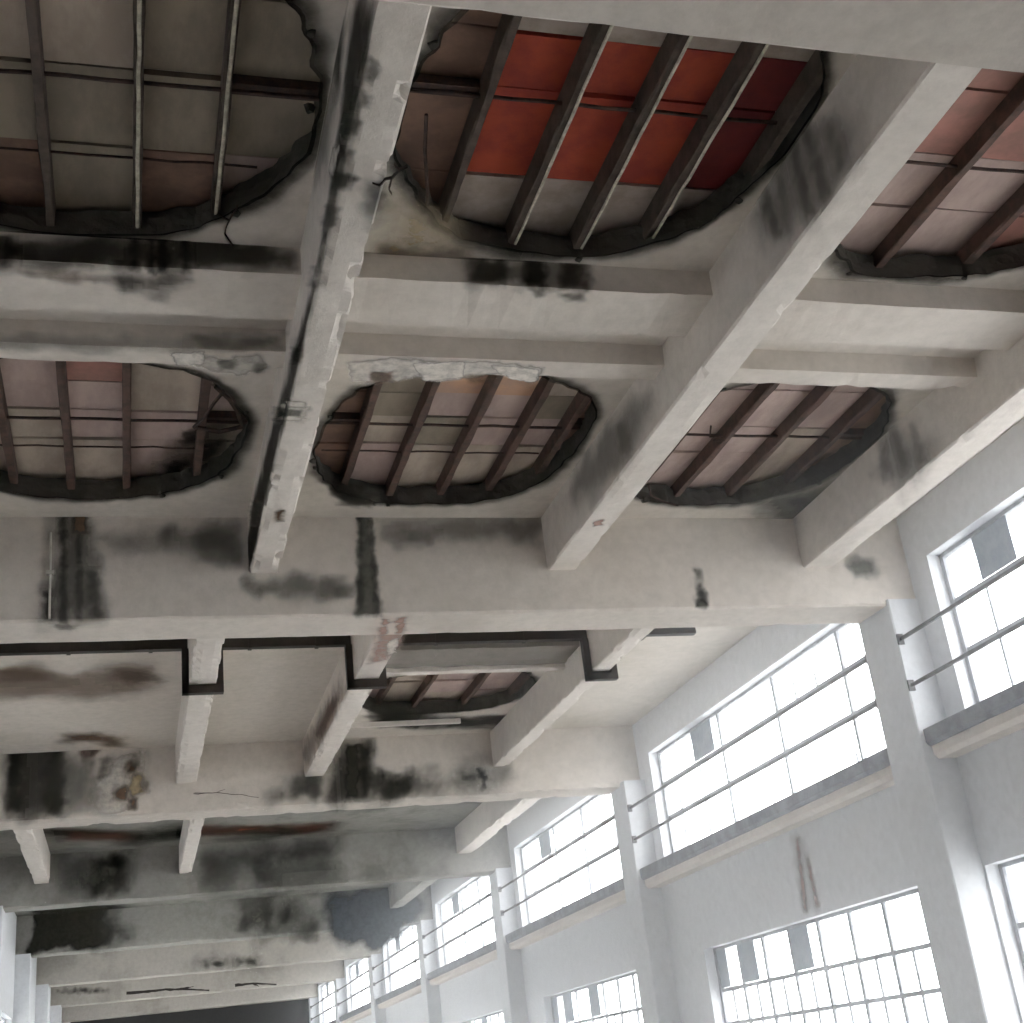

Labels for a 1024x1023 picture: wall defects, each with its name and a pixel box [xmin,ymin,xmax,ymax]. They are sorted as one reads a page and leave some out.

hole [0,0,330,241]
spalling [388,8,832,263]
spalling [830,68,1024,283]
damp [0,237,295,290]
spalling [0,351,265,502]
spalling [309,358,601,507]
hole [634,383,897,508]
damp [335,481,381,617]
damp [7,751,87,821]
damp [272,740,431,804]
damp [25,854,130,956]
damp [324,887,423,951]